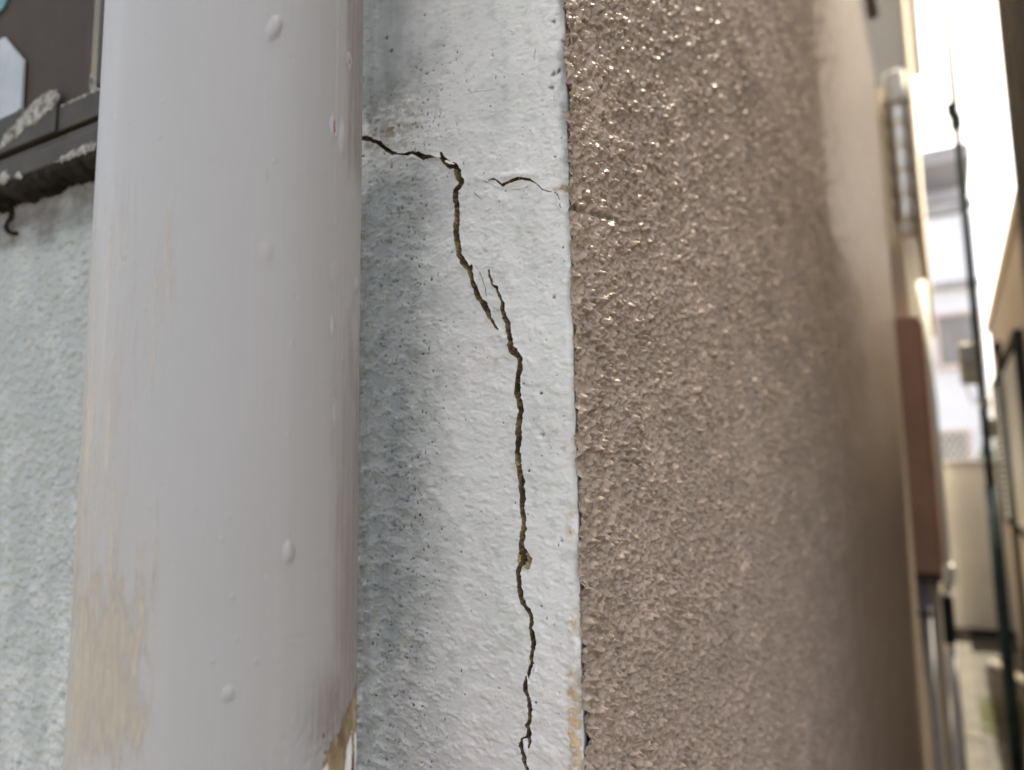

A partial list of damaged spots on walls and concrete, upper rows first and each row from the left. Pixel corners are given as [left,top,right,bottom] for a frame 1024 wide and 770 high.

crack [362,135,561,770]